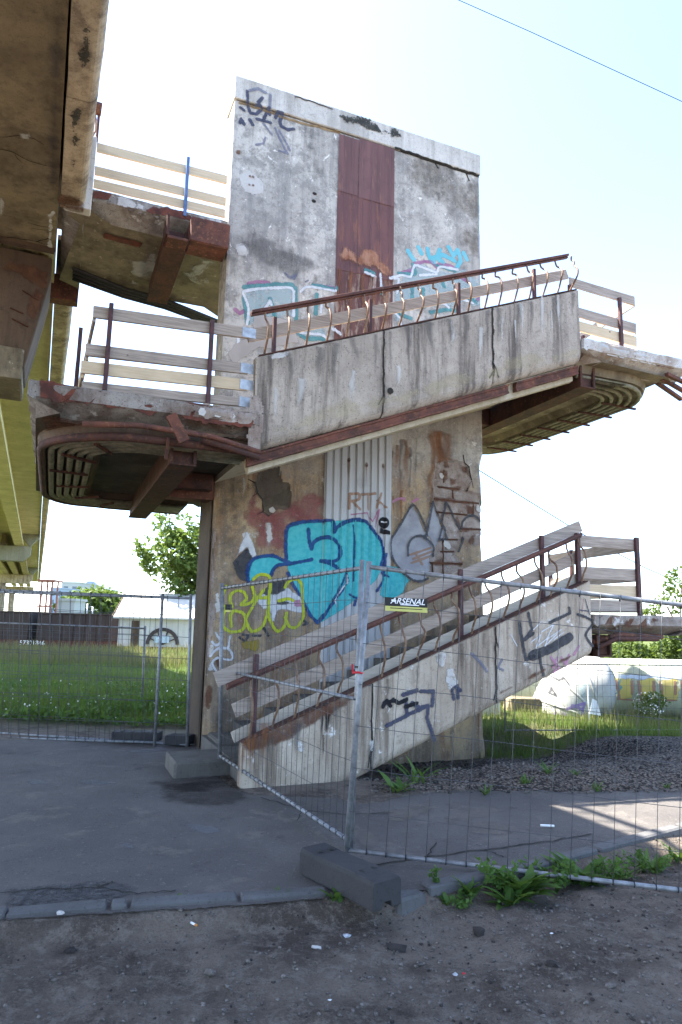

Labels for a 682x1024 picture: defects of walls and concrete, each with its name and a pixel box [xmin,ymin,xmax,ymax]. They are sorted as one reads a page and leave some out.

leakage [339,115,401,137]
crack [395,147,480,181]
peeling [117,197,166,220]
corrosion [339,248,391,303]
crack [377,331,385,405]
crack [489,308,499,378]
spalling [254,467,292,542]
corrosion [244,693,354,751]